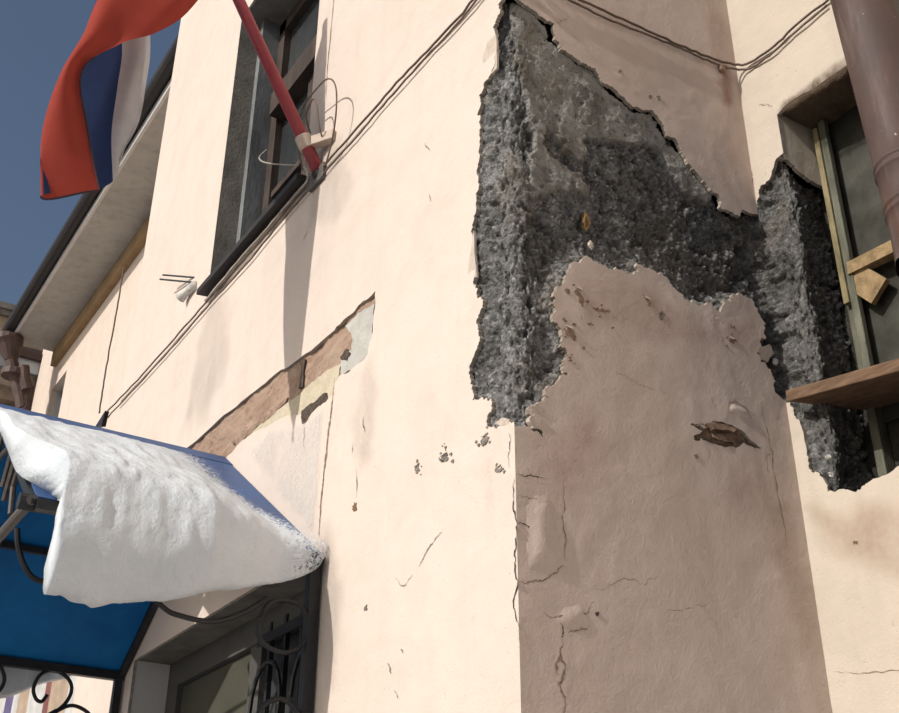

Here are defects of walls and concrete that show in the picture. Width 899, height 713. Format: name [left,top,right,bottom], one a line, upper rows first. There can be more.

spalling [468,2,873,492]
spalling [189,297,376,457]
spalling [438,443,454,463]
crack [508,435,541,642]
crack [762,407,787,540]
crack [555,640,566,713]